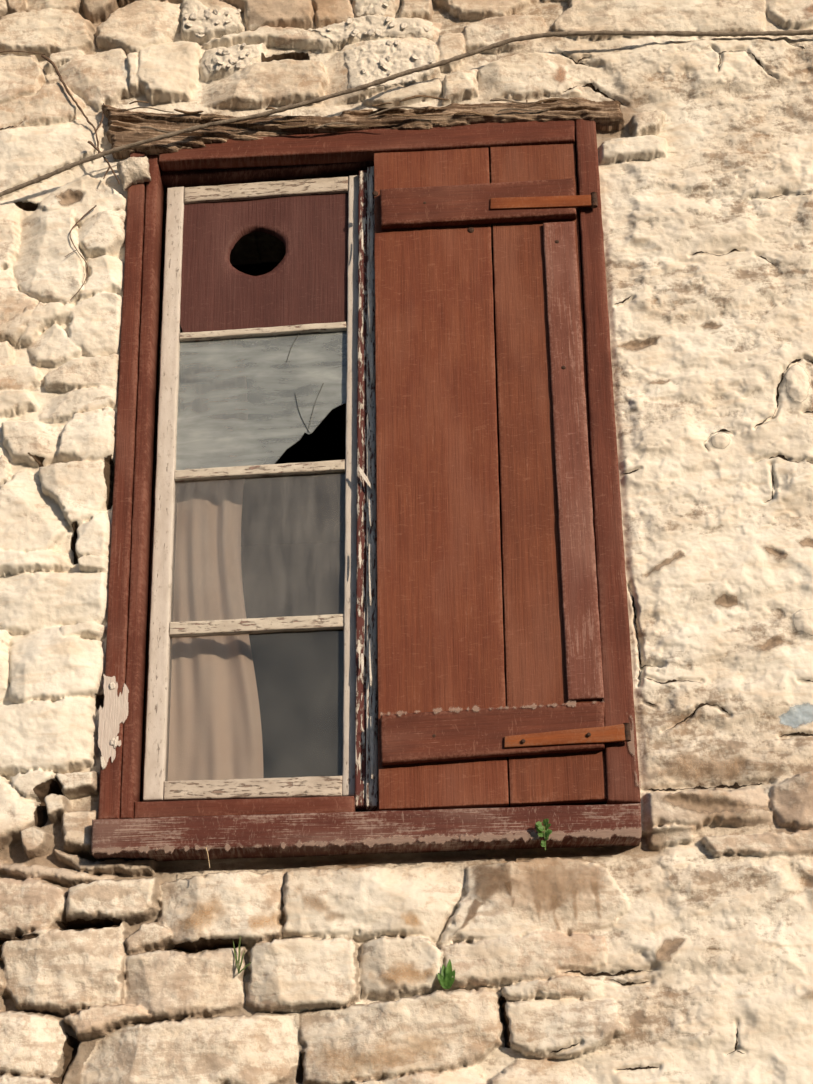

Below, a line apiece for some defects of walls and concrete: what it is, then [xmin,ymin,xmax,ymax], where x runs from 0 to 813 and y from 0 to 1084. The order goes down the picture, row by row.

crack [559,53,627,106]
peeling [361,230,373,262]
crack [705,359,813,449]
peeling [357,466,373,526]
crack [765,455,813,503]
peeling [359,544,372,606]
peeling [361,638,373,686]
crack [629,585,730,731]
peeling [98,674,129,769]
peeling [370,710,420,779]
peeling [92,845,211,854]
peeling [254,826,642,848]